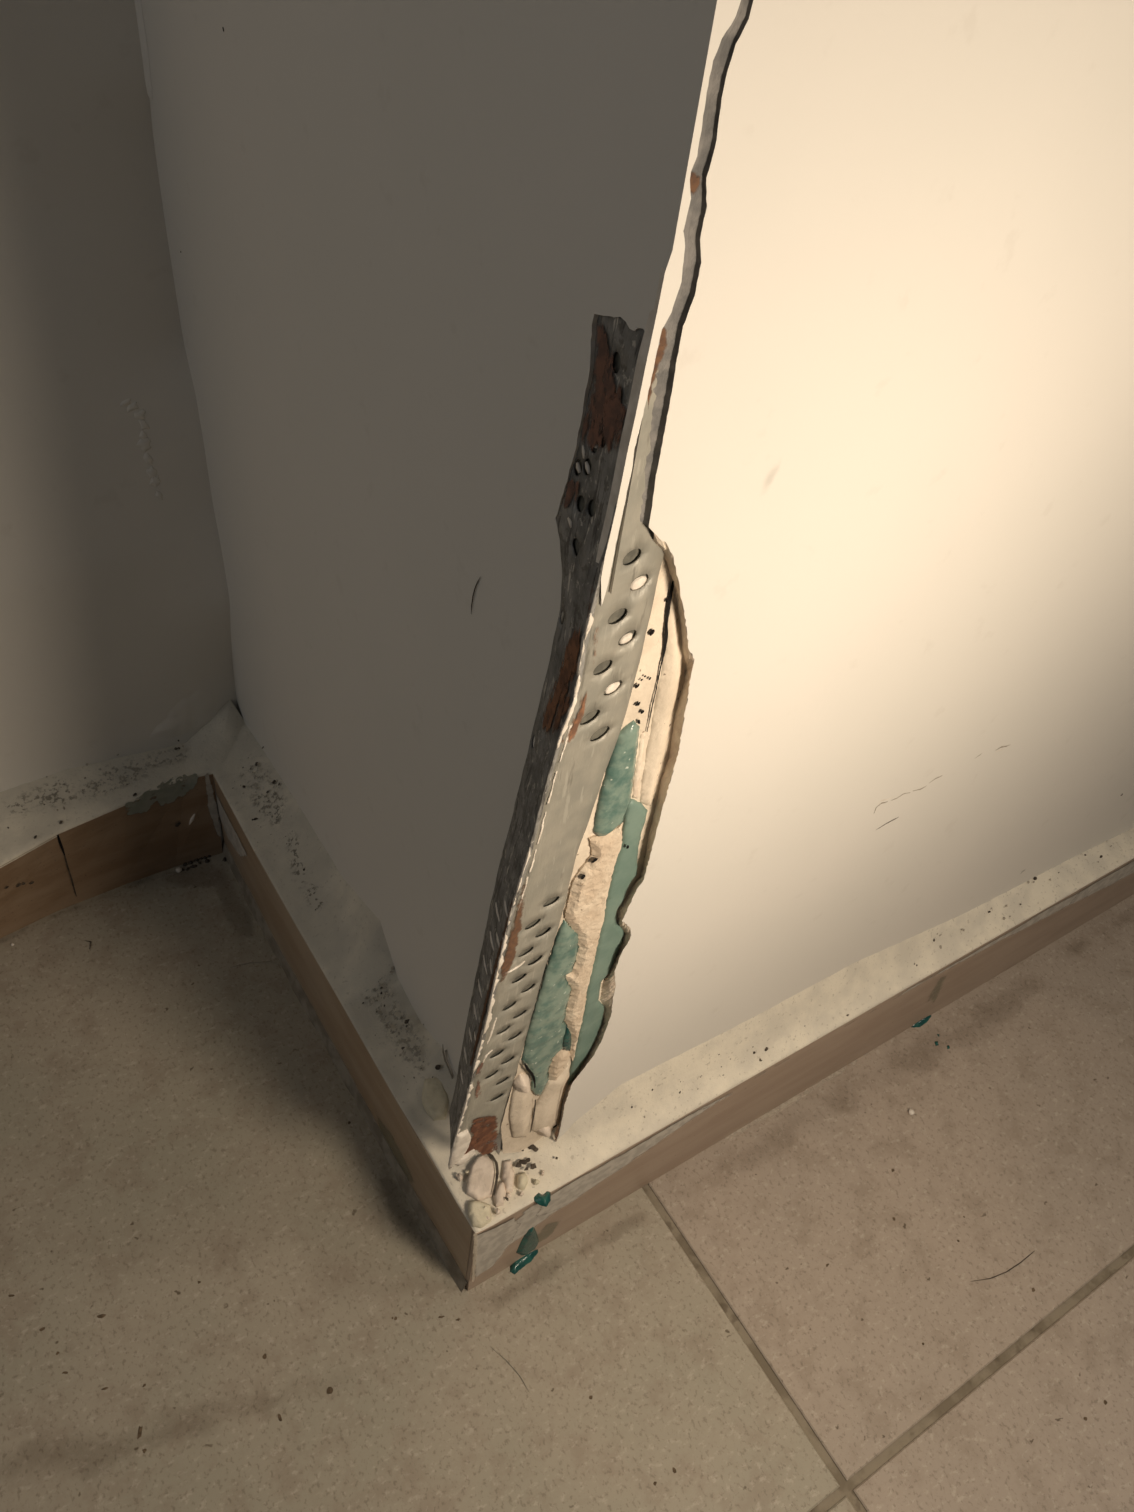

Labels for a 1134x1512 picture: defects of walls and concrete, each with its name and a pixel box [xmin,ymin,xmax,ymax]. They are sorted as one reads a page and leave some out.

crack [640,0,753,527]
corrosion [582,325,625,451]
corrosion [542,589,597,743]
corrosion [469,885,525,1098]
peeling [448,613,594,1170]
flaking render [501,534,694,1154]
corrosion [464,1116,498,1155]